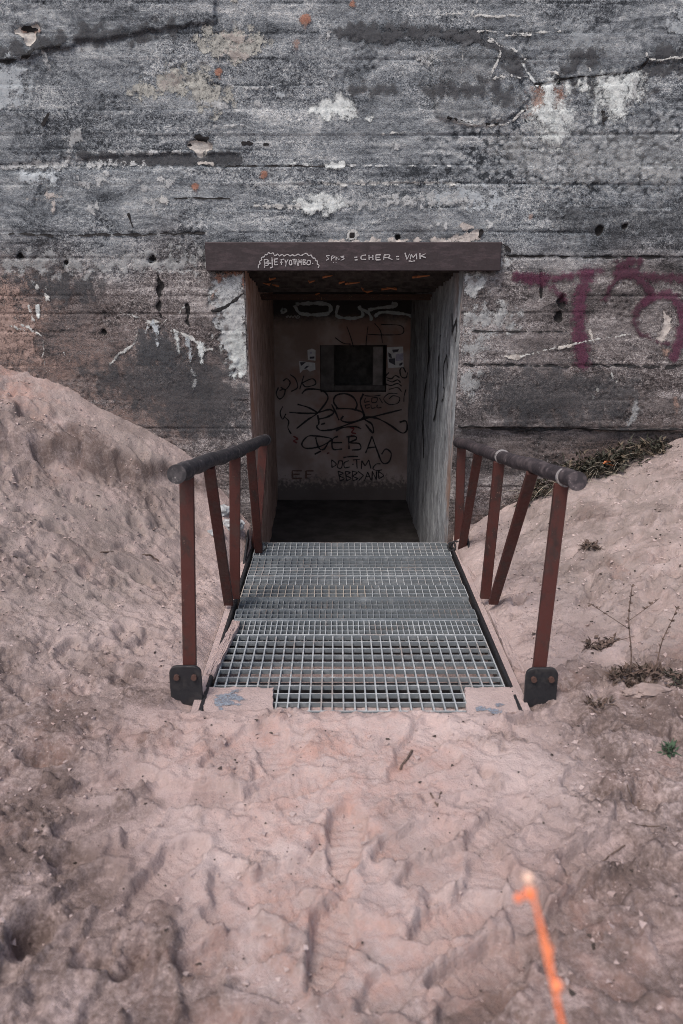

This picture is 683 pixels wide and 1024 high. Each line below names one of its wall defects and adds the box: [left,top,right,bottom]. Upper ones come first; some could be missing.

spalling [14,24,41,46]
peeling [119,21,274,166]
spalling [307,92,373,122]
crack [438,1,683,127]
damp [134,319,213,387]